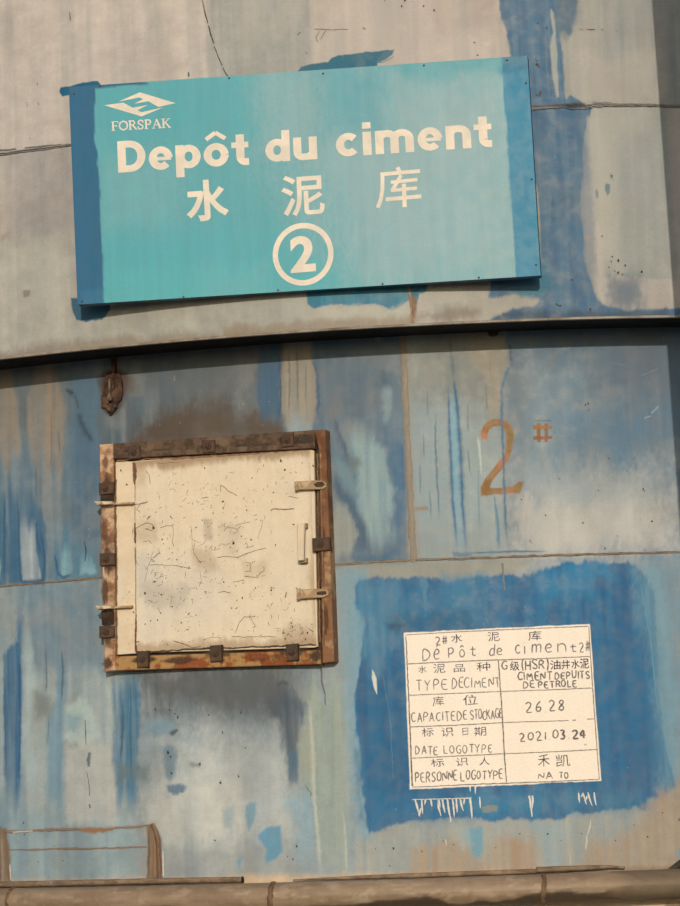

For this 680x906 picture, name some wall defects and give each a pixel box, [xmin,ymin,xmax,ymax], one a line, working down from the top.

corrosion [95,367,138,418]
corrosion [101,434,328,668]
corrosion [0,822,164,888]